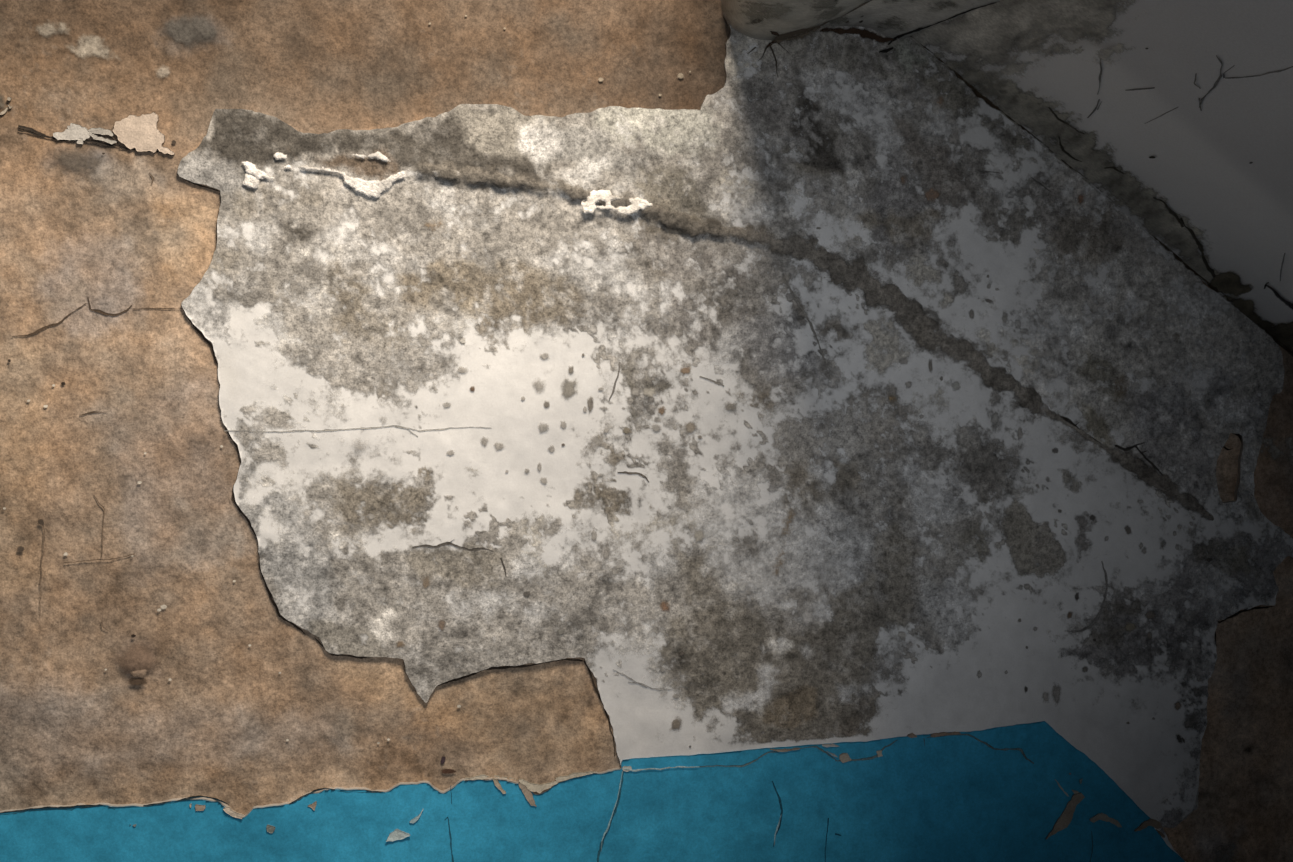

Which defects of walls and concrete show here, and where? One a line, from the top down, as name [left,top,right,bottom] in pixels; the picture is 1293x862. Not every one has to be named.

crack [819,2,1293,198]
flaking render [0,0,1034,819]
crack [609,362,621,401]
crack [617,471,649,482]
water stain [178,0,1285,743]
peeling [998,469,1097,595]
crack [1153,197,1230,301]
flaking render [1201,271,1293,538]
crack [1264,253,1293,310]
water stain [1061,517,1293,802]
flaking render [1089,556,1293,862]
peeling [386,809,424,842]